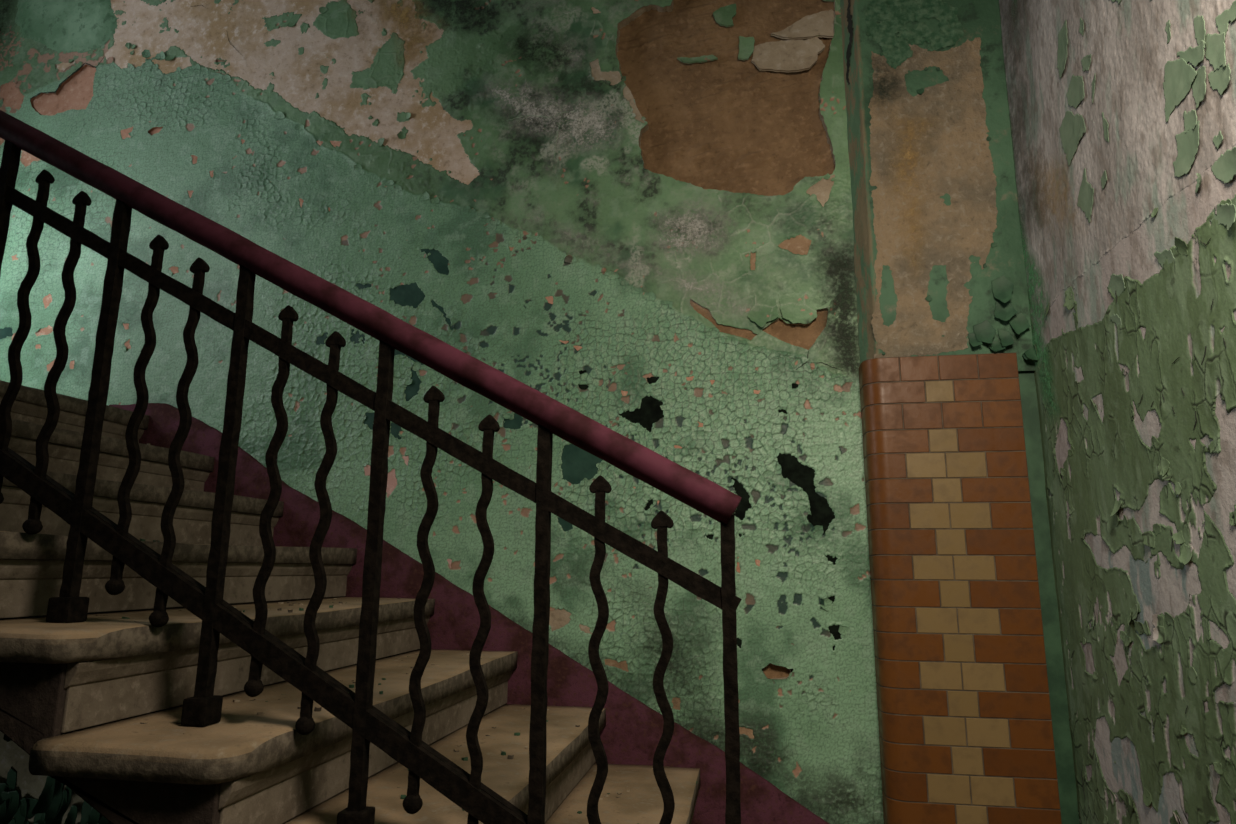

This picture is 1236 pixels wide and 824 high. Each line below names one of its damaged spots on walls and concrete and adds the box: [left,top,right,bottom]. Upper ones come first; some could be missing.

peeling [0,0,480,185]
spalling [590,0,836,207]
peeling [868,37,998,358]
peeling [1034,0,1236,361]
peeling [617,375,667,432]
peeling [728,477,755,537]
peeling [690,292,832,350]
peeling [770,449,835,537]
peeling [1080,401,1202,686]
peeling [1190,394,1236,599]
peeling [0,731,112,824]
peeling [1085,717,1188,824]